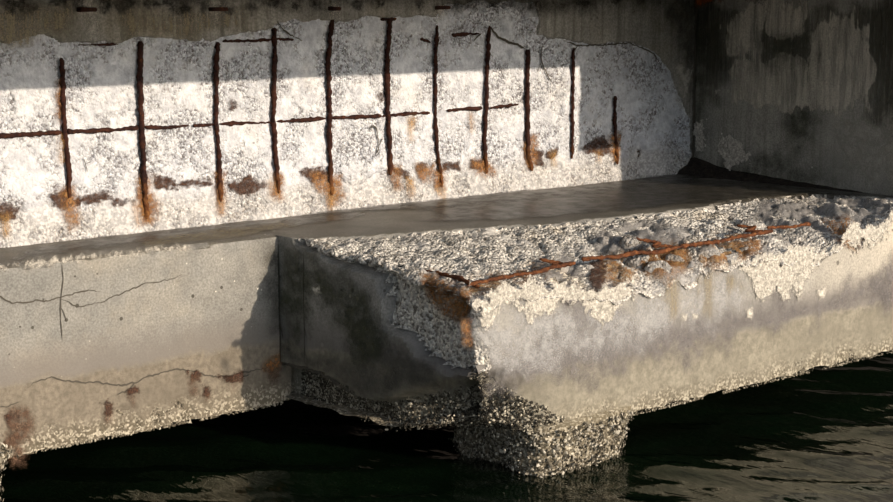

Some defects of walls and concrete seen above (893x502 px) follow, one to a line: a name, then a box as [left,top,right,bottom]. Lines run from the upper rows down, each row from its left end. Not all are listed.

damp [665,0,893,124]
corrosion [0,199,20,235]
corrosion [50,173,284,225]
corrosion [299,166,345,209]
spalling [0,0,707,248]
corrosion [392,159,496,191]
spalling [717,134,752,171]
spalling [27,254,95,267]
crack [0,267,182,333]
crack [32,244,283,395]
spalling [298,194,893,373]
corrosion [589,234,760,313]